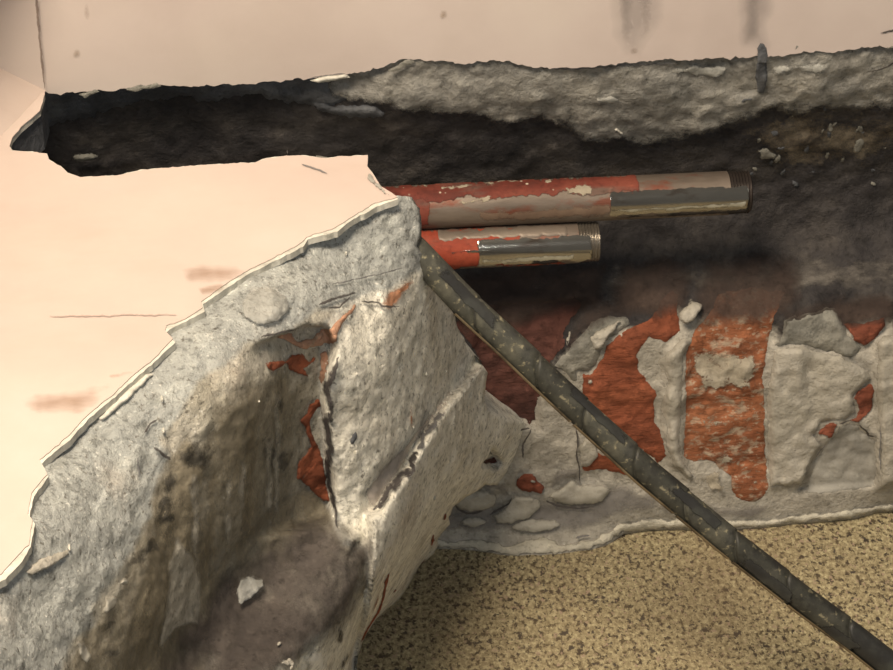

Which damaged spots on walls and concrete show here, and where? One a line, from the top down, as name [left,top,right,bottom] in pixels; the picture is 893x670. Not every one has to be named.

spalling [45,43,893,144]
crack [261,328,299,337]
crack [319,268,402,309]
corrosion [384,282,411,306]
flaking render [456,320,540,425]
flaking render [440,268,600,363]
flaking render [570,260,687,463]
flaking render [683,259,796,502]
crack [322,357,339,528]
spalling [367,392,450,510]
water stain [71,374,370,670]
corrosion [361,574,396,642]